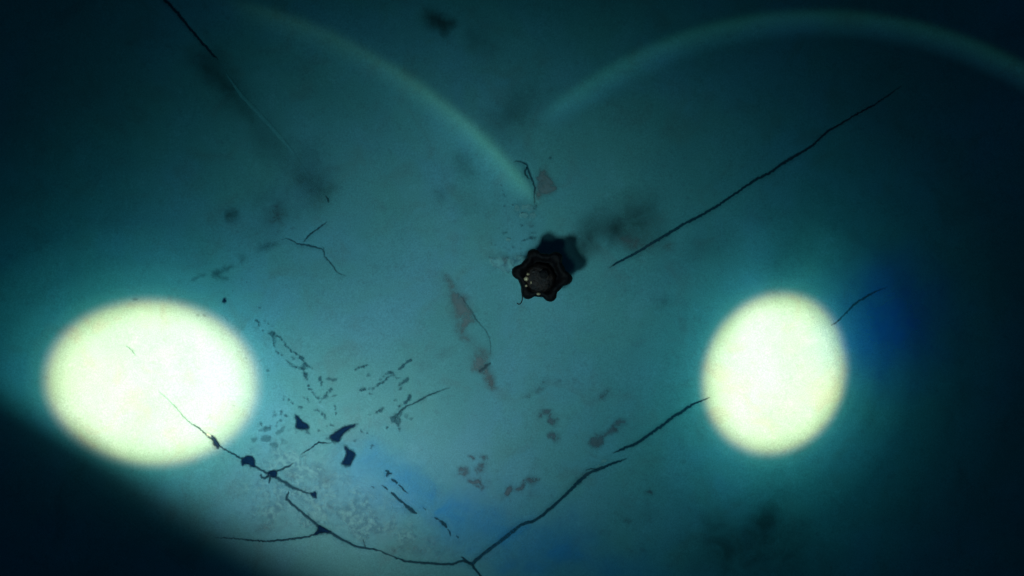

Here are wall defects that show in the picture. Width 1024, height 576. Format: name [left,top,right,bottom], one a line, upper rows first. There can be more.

crack [163,0,217,58]
crack [517,161,536,194]
crack [612,92,893,266]
crack [291,198,336,271]
crack [193,398,708,576]